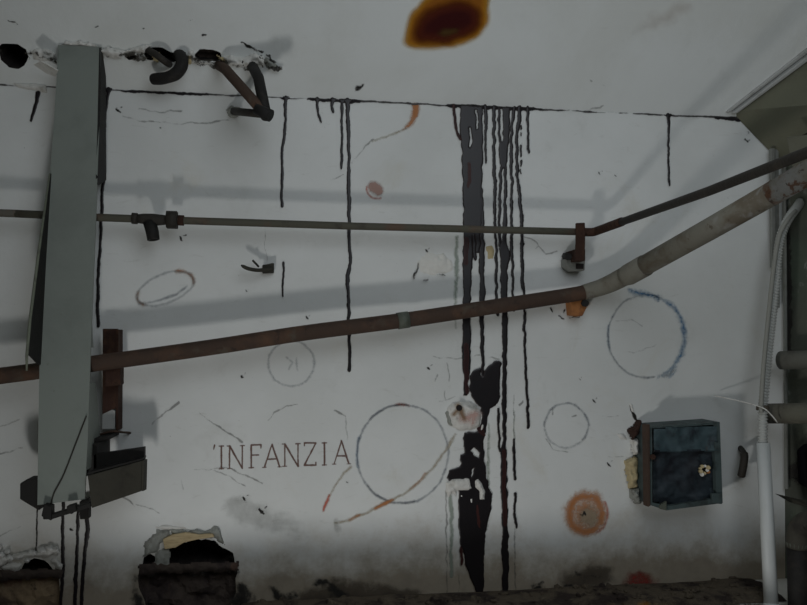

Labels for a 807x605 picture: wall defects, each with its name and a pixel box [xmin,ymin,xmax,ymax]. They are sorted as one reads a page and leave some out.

spalling [0,44,58,76]
spalling [62,40,176,62]
spalling [185,42,282,72]
crack [112,89,241,97]
crack [270,97,749,142]
damp [330,97,352,320]
damp [452,104,530,304]
spalling [445,401,483,430]
damp [447,309,530,592]
spalling [0,545,64,605]
spalling [133,525,251,605]